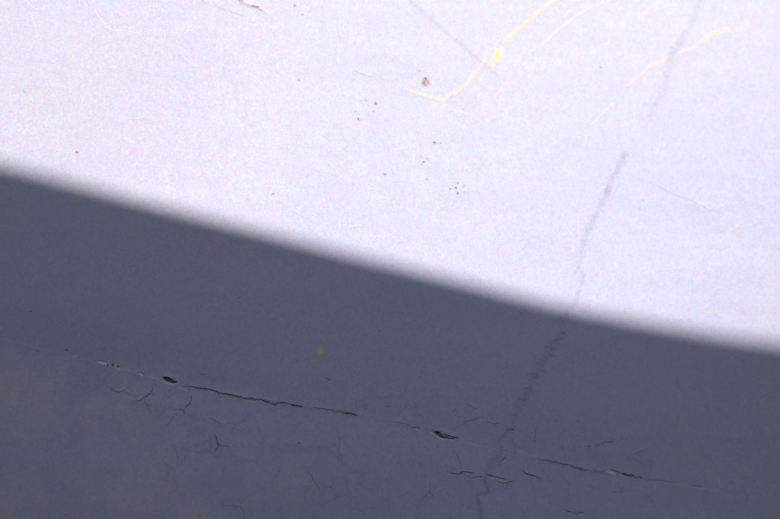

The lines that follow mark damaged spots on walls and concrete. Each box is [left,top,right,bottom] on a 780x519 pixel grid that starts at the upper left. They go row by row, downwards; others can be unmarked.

crack [120,368,424,431]